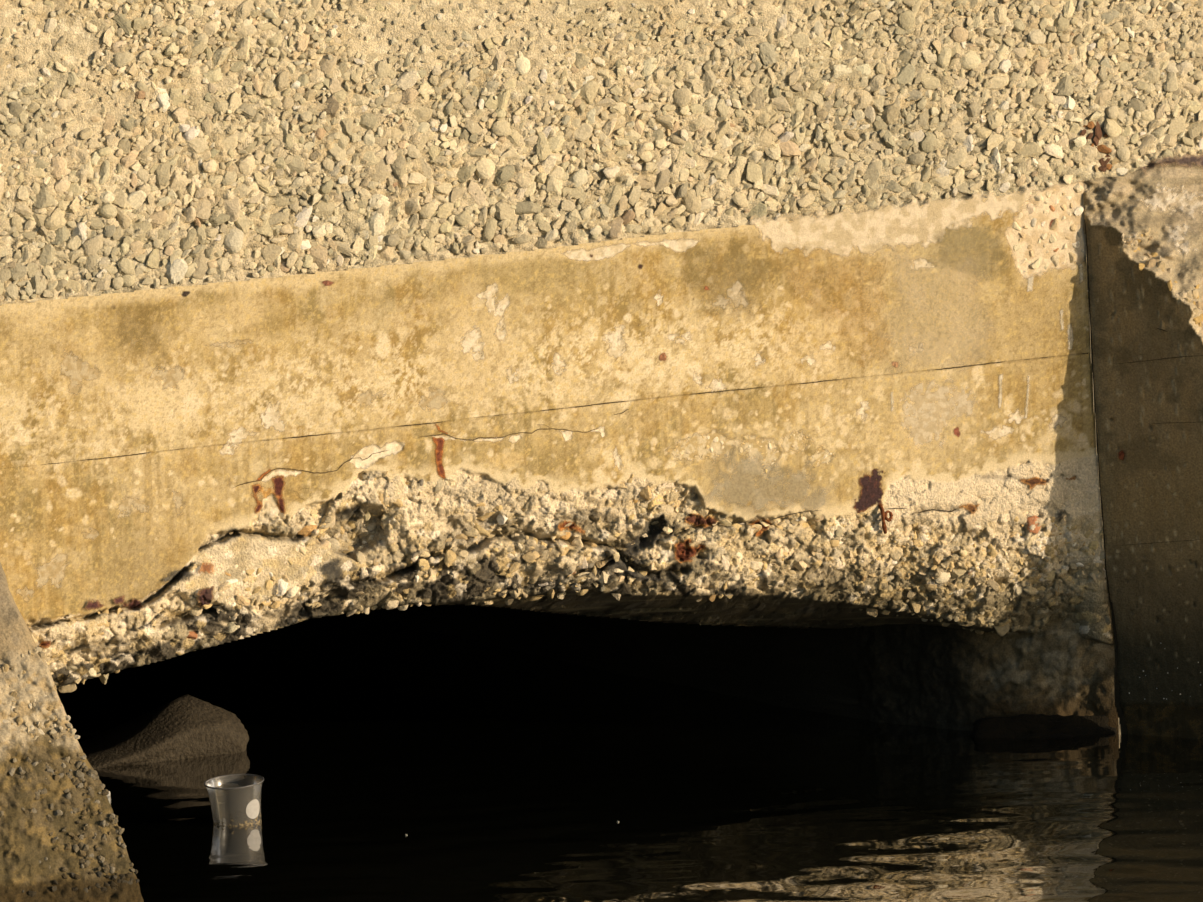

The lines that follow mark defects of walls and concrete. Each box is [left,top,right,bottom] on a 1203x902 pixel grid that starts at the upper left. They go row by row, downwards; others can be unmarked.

peeling [751,181,1087,278]
crack [935,357,1048,370]
crack [695,386,762,394]
crack [45,448,184,465]
crack [233,400,635,503]
corrosion [433,424,448,479]
peeling [471,435,521,443]
spalling [667,429,834,473]
peeling [981,409,1022,440]
corrosion [252,469,286,514]
corrosion [854,469,883,513]
spalling [0,441,1113,892]